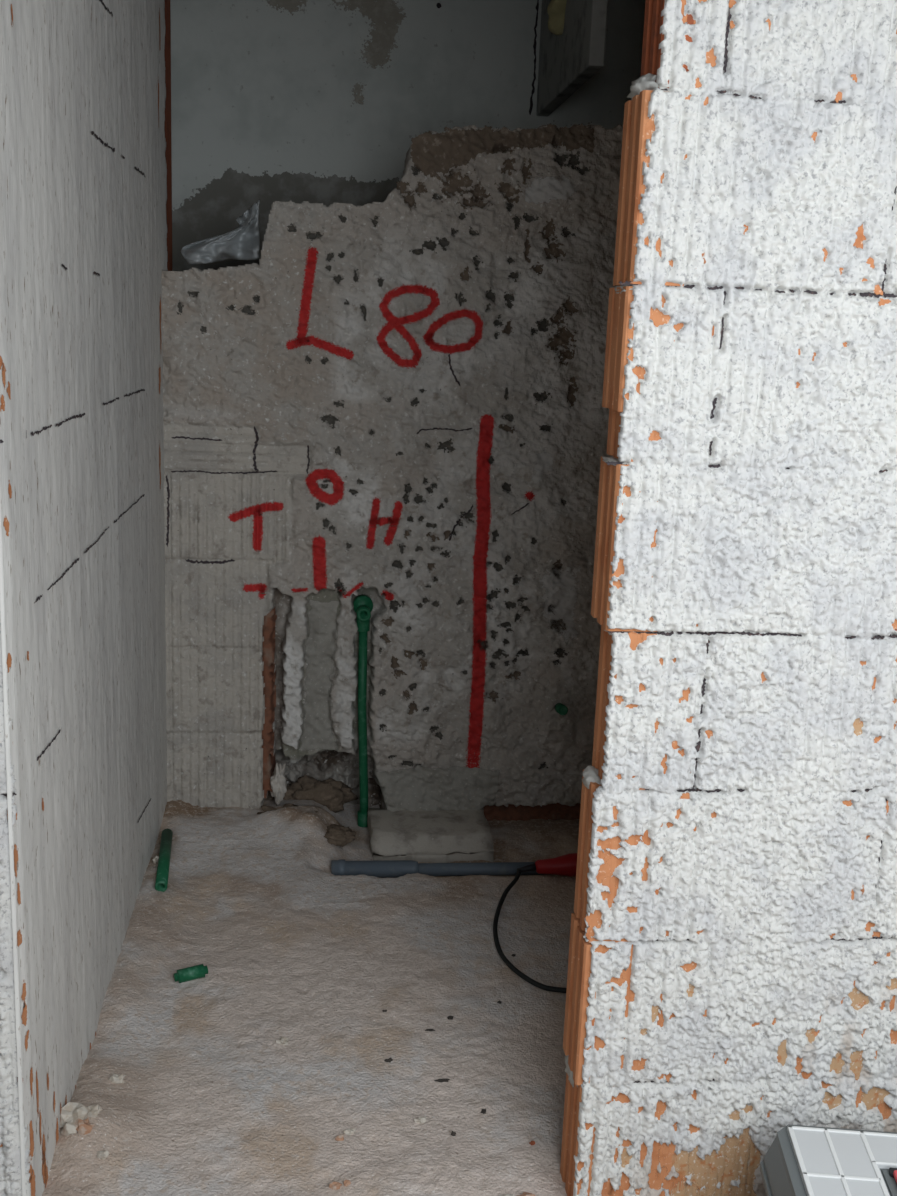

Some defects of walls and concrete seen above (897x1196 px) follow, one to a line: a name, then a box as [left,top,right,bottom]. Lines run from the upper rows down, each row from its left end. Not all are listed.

spalling [548,605,569,665]
flaking render [484,803,581,821]
peeling [586,793,690,954]
peeling [606,1093,772,1196]
peeling [575,1161,584,1195]